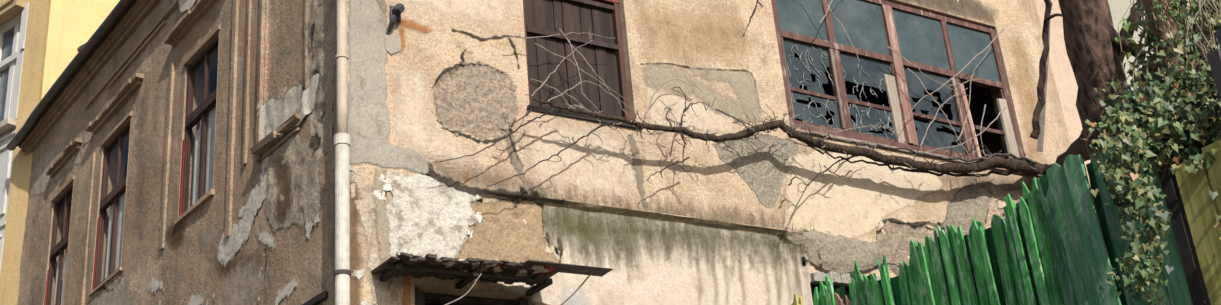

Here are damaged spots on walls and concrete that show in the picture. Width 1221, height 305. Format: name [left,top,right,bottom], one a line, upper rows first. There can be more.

spalling [178,0,196,12]
corrosion [397,20,429,49]
crack [435,29,525,85]
crack [641,63,759,102]
crack [743,0,763,37]
spalling [182,0,336,305]
peeling [350,61,559,305]
crack [428,119,565,263]
flaking render [528,124,636,198]
damp [534,194,804,257]
spalling [646,88,798,208]
spalling [876,183,1024,266]